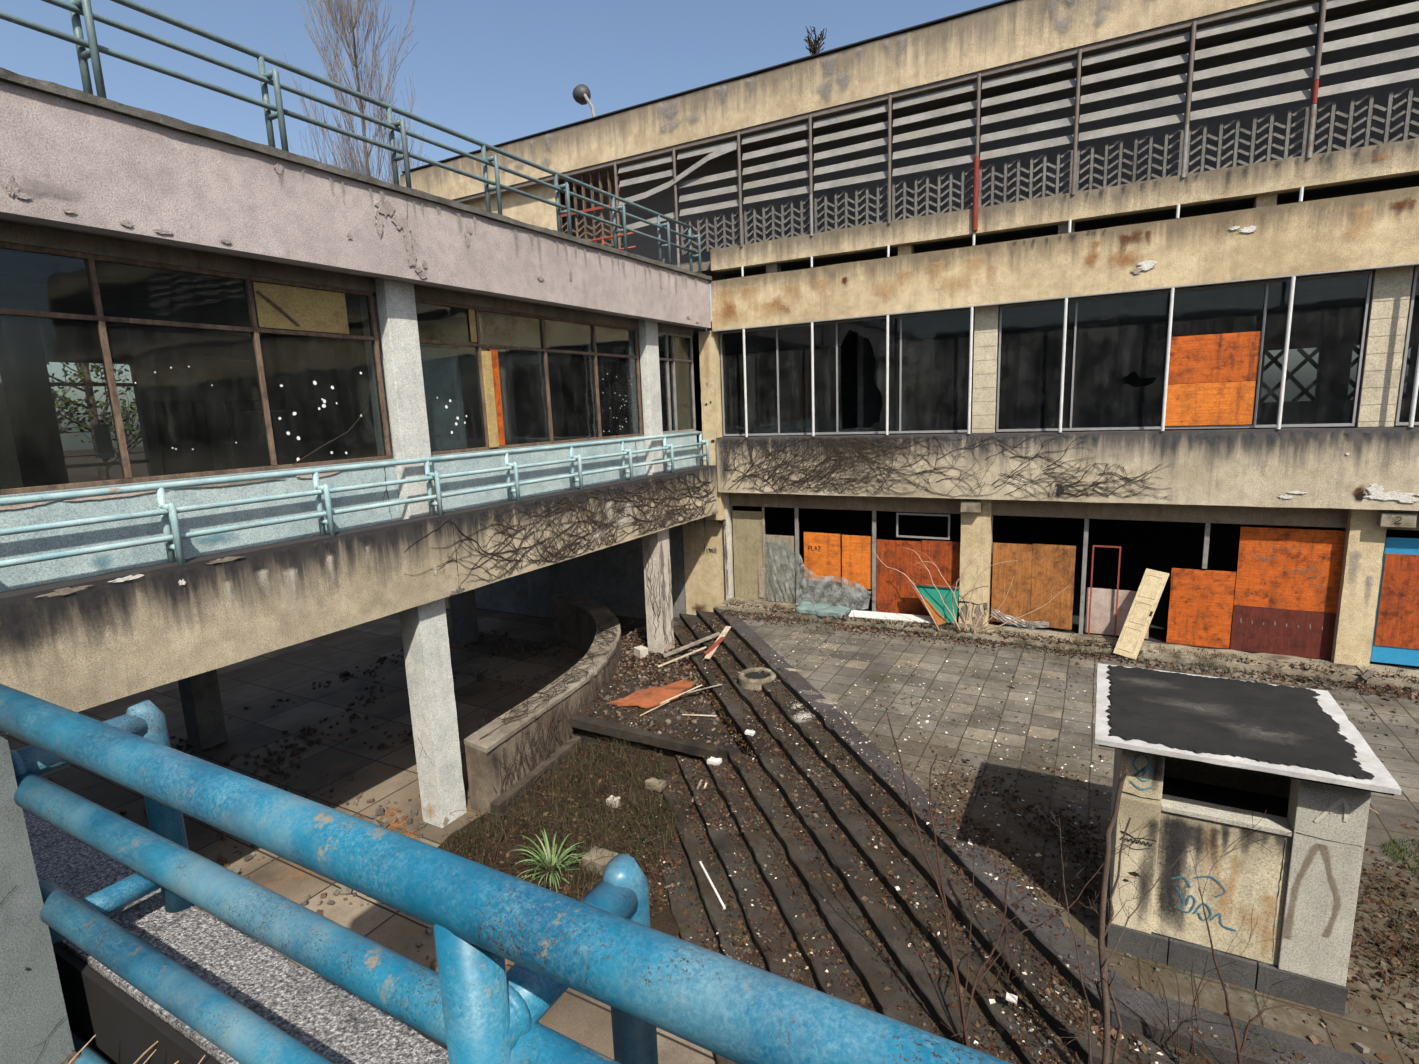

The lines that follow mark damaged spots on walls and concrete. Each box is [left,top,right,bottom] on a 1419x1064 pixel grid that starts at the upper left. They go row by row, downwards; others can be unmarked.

spalling [1130,260,1157,274]
spalling [1356,484,1419,503]
damp [252,548,295,590]
damp [312,528,397,568]
damp [0,561,233,642]
damp [1140,821,1286,921]